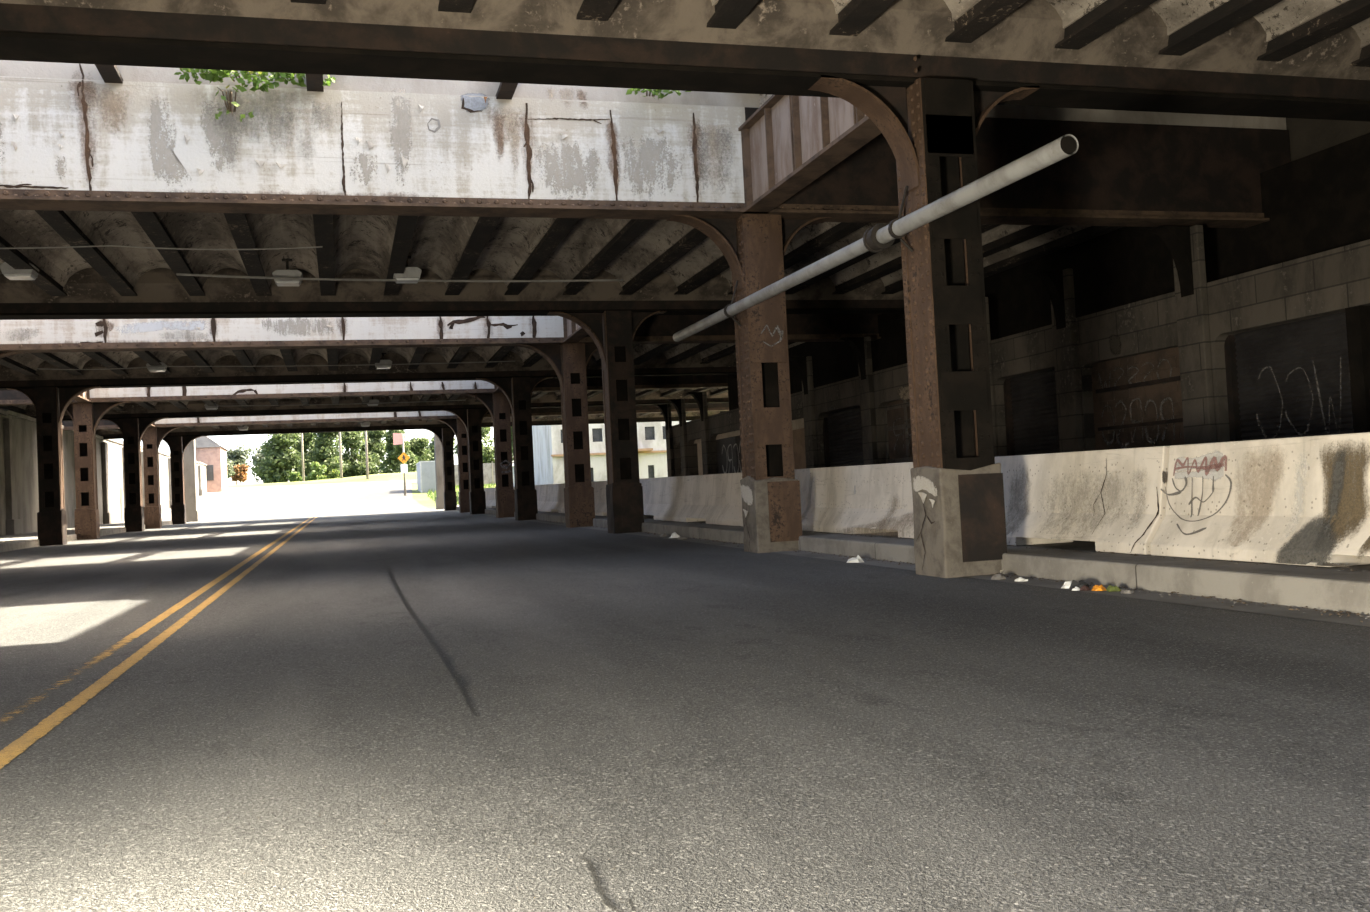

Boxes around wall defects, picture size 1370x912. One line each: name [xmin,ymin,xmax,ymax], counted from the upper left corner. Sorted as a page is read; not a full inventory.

crack [573,848,639,912]